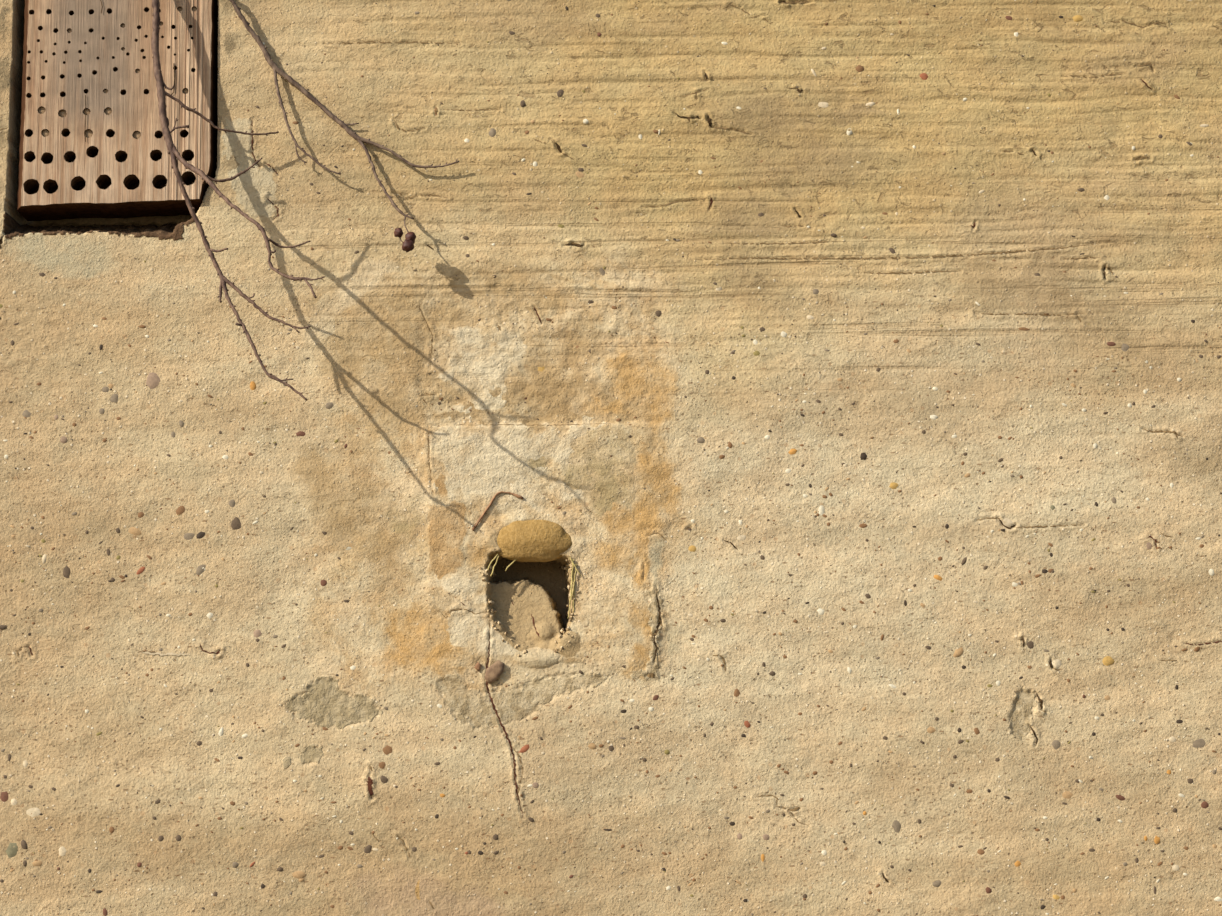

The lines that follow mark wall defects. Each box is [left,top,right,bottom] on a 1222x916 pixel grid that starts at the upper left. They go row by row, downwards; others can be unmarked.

crack [441,599,539,817]
spalling [433,586,664,730]
crack [642,526,692,678]